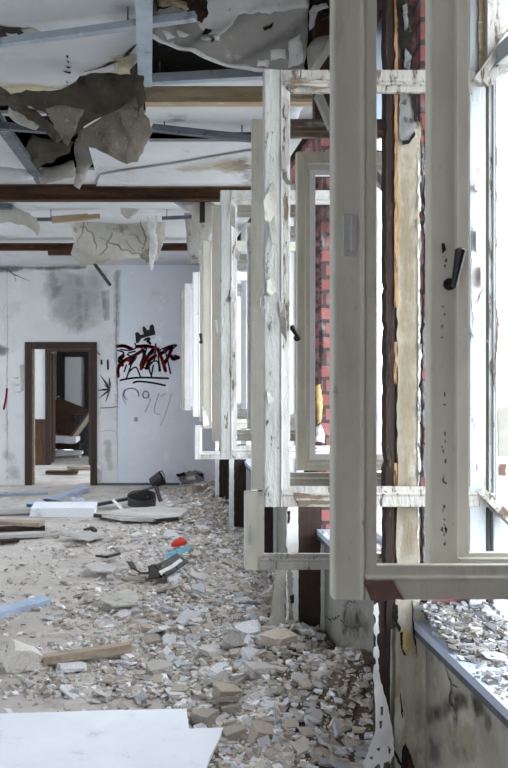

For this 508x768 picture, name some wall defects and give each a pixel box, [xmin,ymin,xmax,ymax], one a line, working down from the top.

peeling [156,0,309,43]
peeling [257,34,303,68]
peeling [263,78,330,352]
crack [77,221,149,258]
peeling [293,492,330,506]